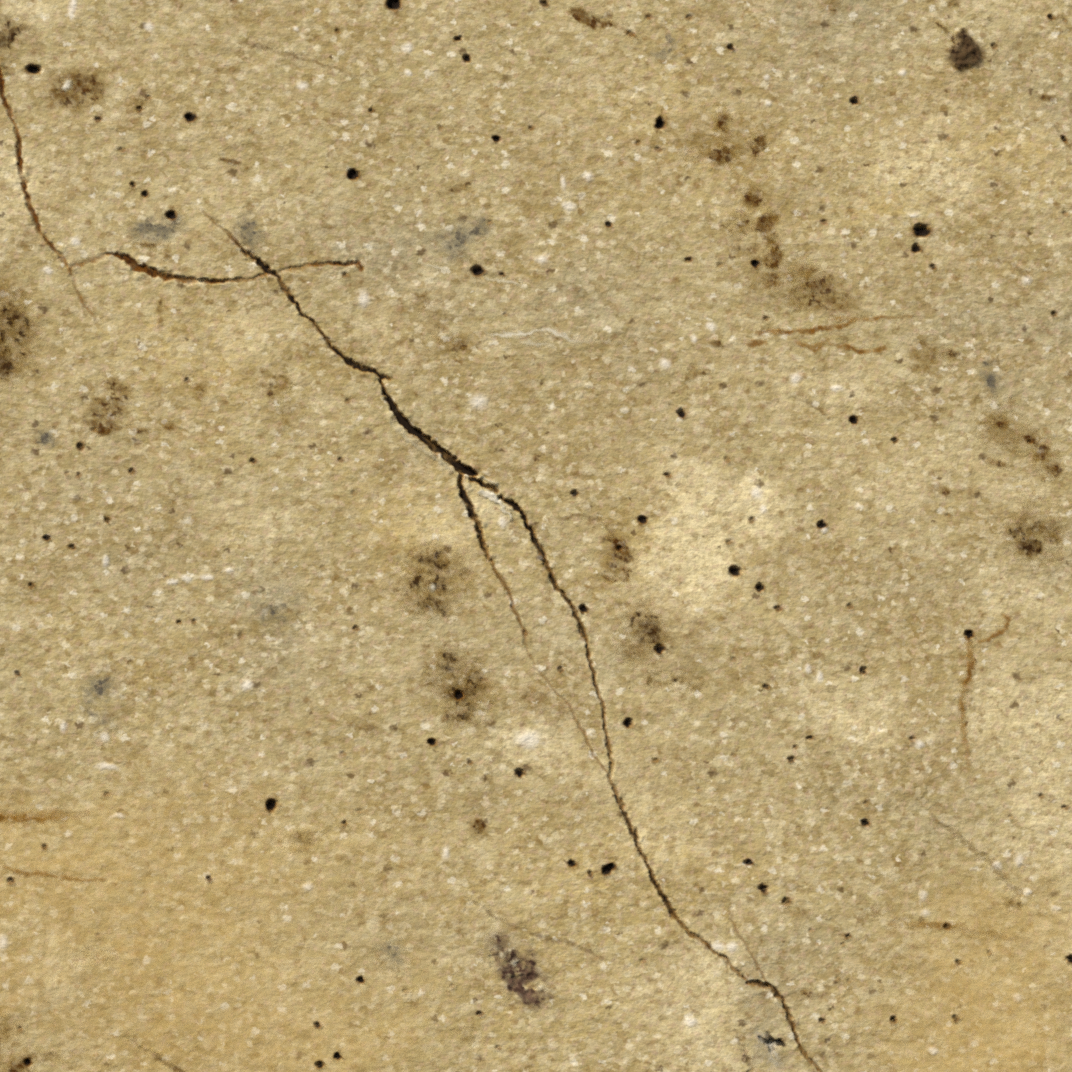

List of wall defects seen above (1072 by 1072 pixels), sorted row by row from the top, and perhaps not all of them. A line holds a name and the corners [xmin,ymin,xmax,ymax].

crack [0,69,71,271]
leakage [0,303,29,379]
crack [107,236,611,757]
leakage [1009,522,1052,555]
leakage [410,551,448,616]
leakage [442,652,485,720]
crack [614,788,821,1072]